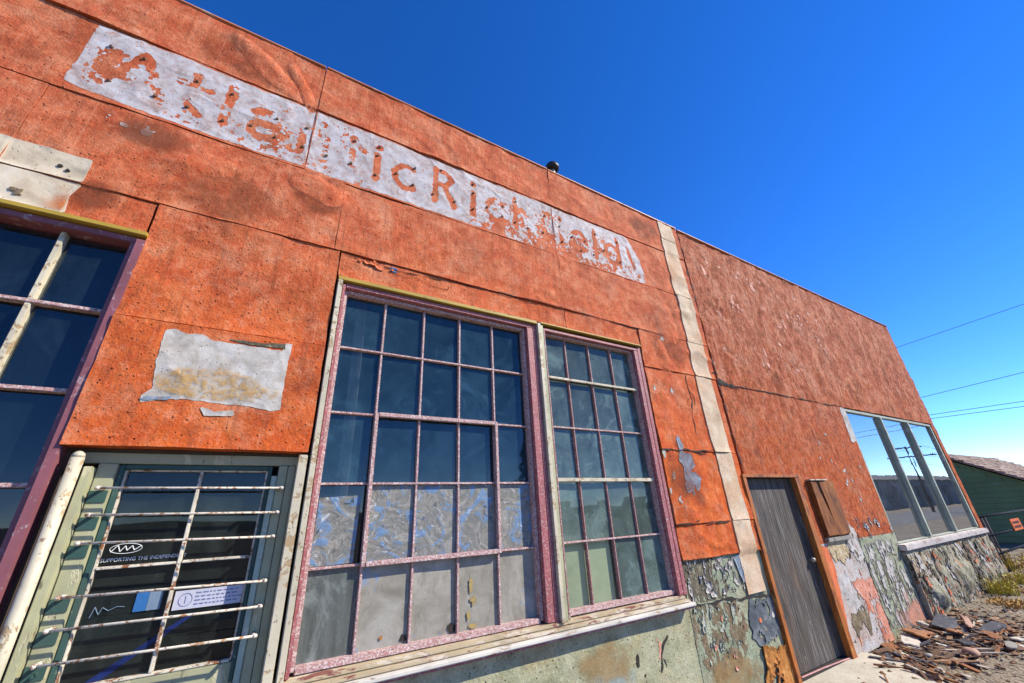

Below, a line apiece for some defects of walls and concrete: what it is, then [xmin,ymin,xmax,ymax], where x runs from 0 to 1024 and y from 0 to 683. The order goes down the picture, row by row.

peeling [0,133,93,212]
peeling [359,259,397,273]
peeling [140,329,292,416]
peeling [670,435,701,508]
flaking render [681,554,796,683]
peeling [822,517,1010,645]